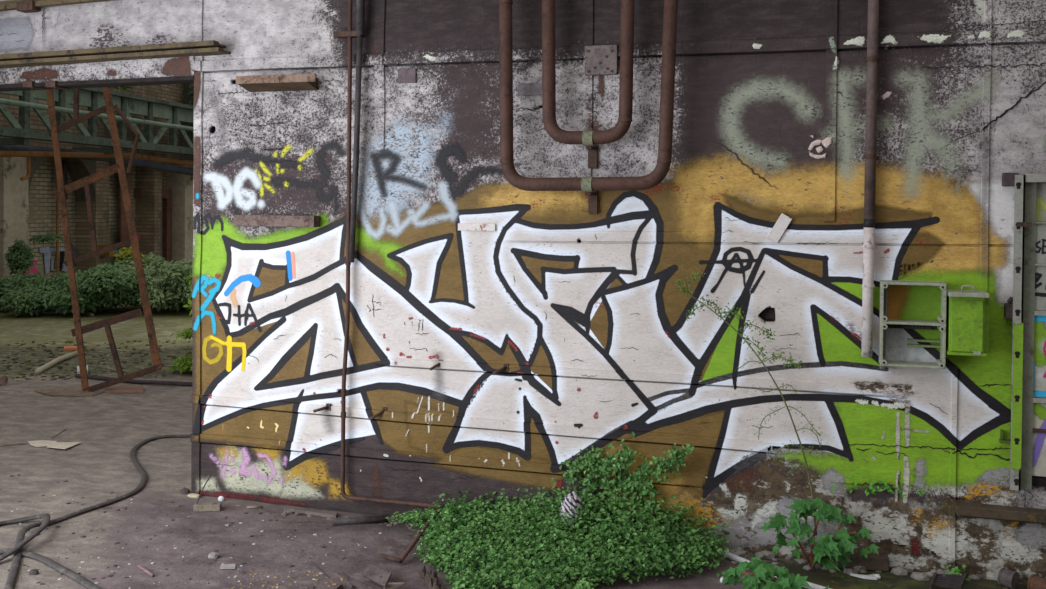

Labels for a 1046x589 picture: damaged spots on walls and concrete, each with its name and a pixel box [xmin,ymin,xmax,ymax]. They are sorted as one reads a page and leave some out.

peeling [829,36,865,70]
peeling [920,34,951,43]
crack [968,19,1046,27]
rust [587,107,599,131]
crack [922,62,1046,149]
peeling [823,468,846,495]
peeling [679,481,841,547]
peeling [860,467,1046,569]